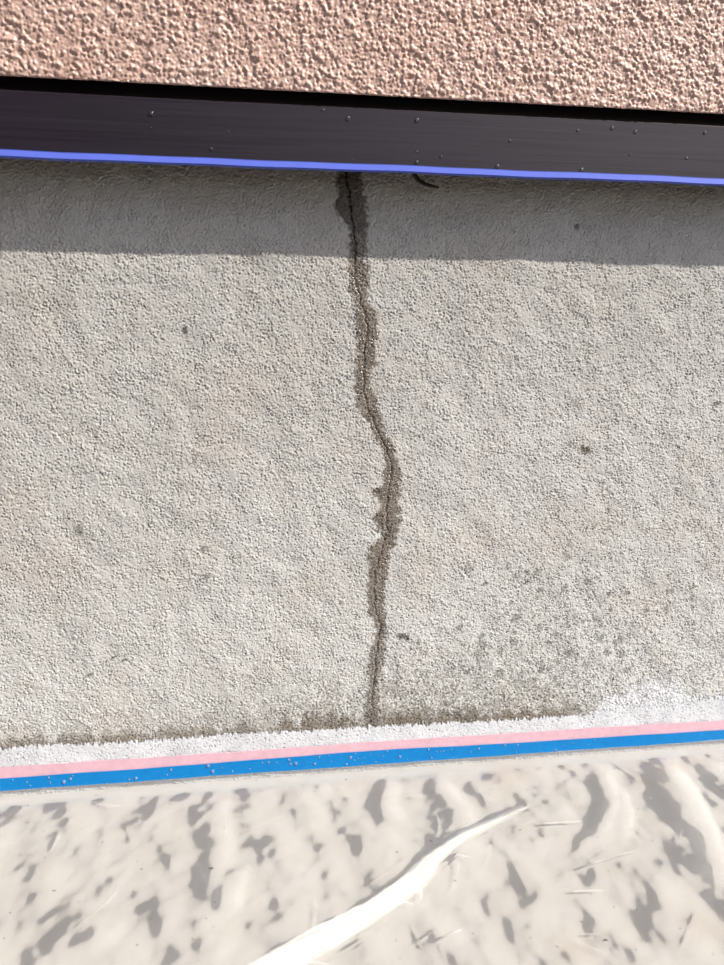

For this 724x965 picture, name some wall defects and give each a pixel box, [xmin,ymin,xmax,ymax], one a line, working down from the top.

crack [345,172,357,262]
water stain [274,171,572,732]